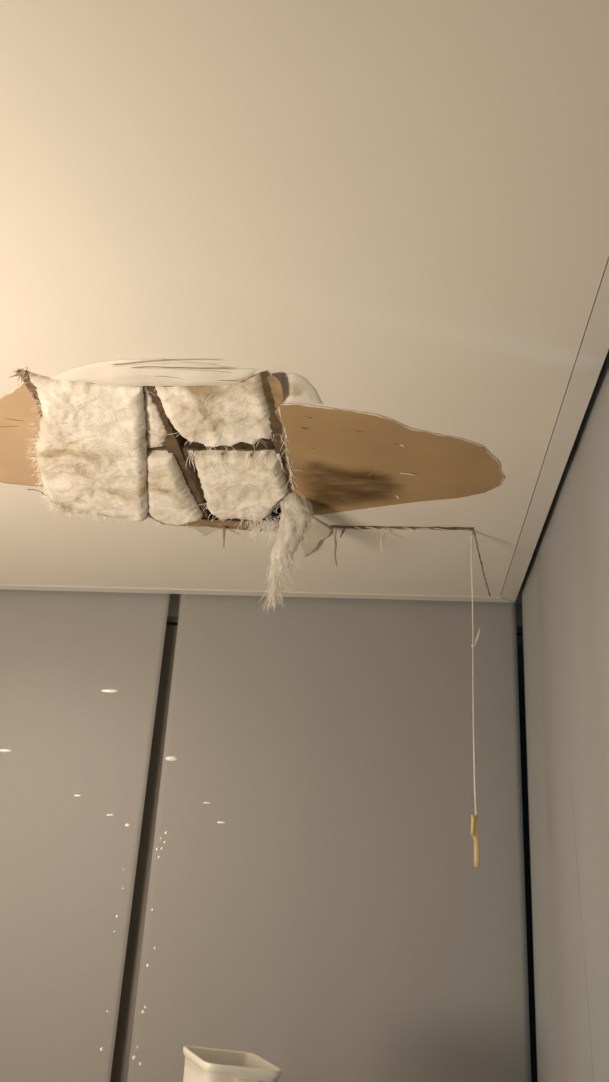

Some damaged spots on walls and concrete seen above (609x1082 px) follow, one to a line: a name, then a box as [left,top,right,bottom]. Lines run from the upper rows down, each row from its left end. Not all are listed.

peeling [0,373,49,498]
leakage [312,466,394,506]
peeling [274,404,505,516]
spalling [147,515,275,531]
crack [331,525,491,596]